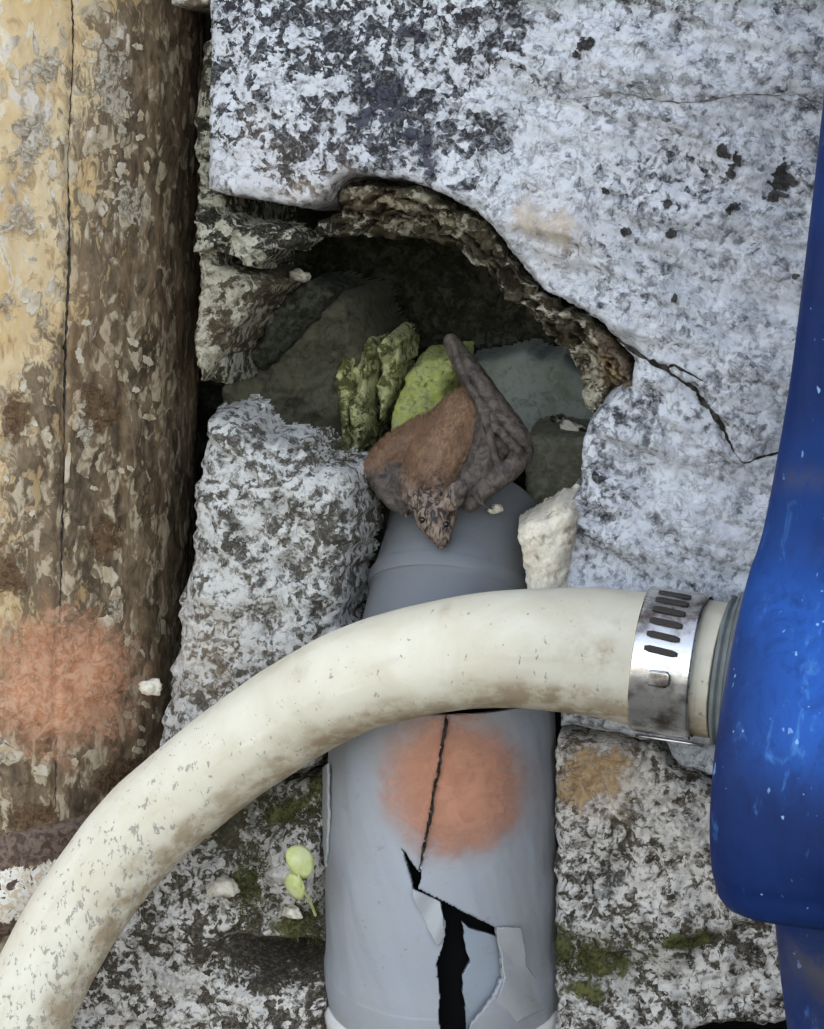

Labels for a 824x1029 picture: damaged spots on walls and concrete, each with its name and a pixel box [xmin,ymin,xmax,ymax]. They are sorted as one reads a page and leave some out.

spalling [278,180,635,413]
crack [517,260,778,464]
spalling [194,368,225,530]
spalling [512,469,526,491]
spalling [549,413,587,432]
spalling [368,500,390,569]
damp [662,928,712,951]
damp [564,980,606,1004]